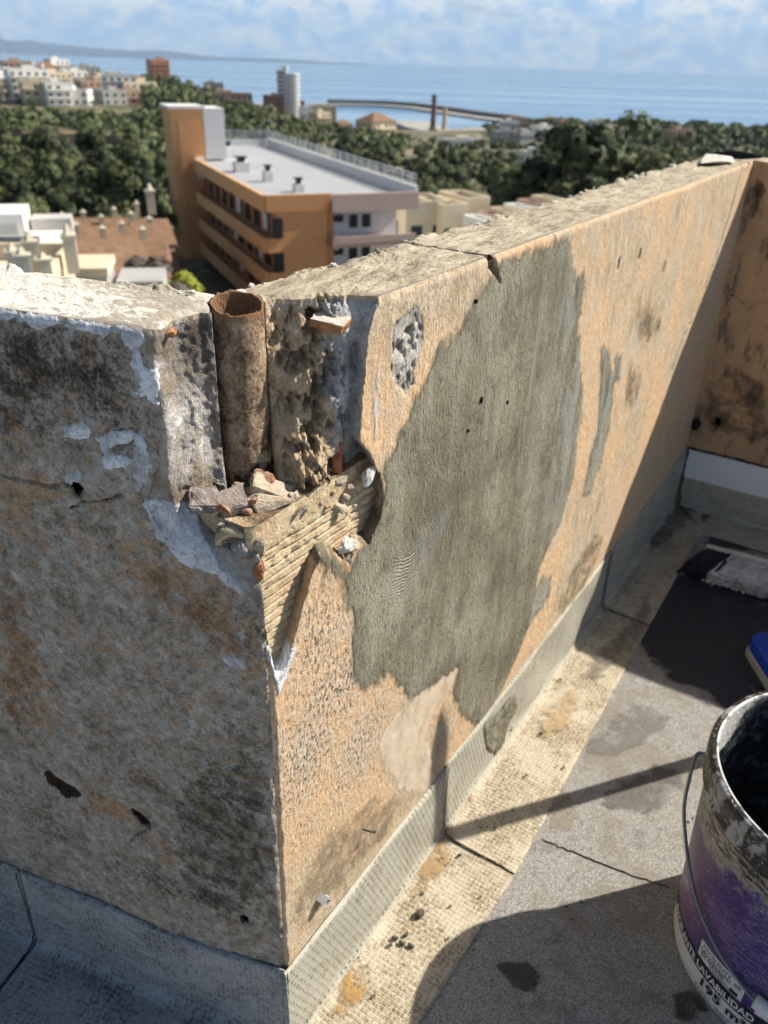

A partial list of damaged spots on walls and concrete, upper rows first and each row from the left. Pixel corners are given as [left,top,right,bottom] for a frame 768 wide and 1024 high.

spalling [264,298,384,515]
flaking render [390,305,424,395]
spalling [0,308,266,628]
spalling [286,533,364,646]
peeling [222,654,246,670]
flaking render [44,770,150,827]